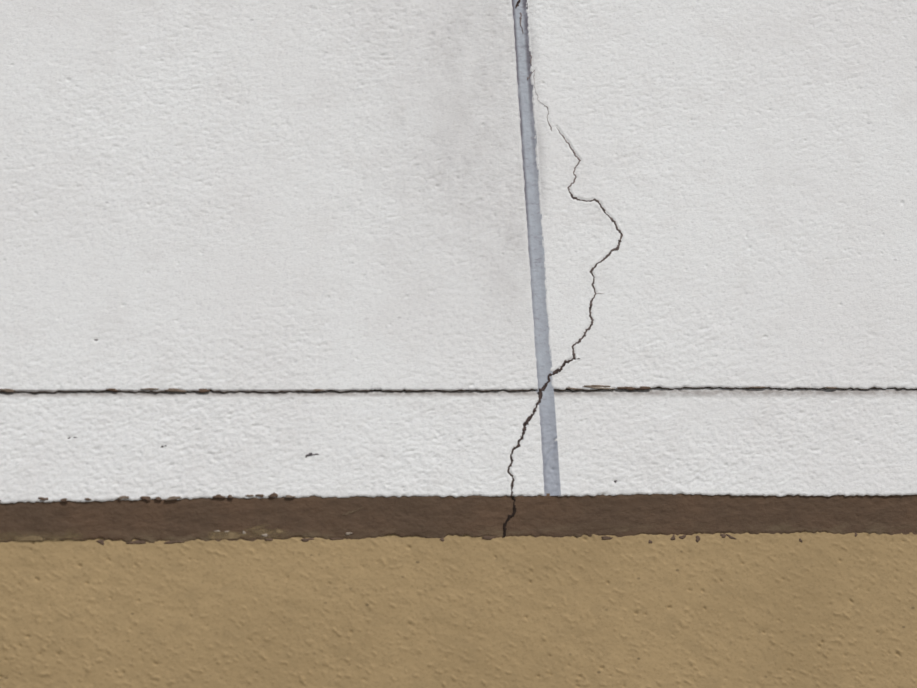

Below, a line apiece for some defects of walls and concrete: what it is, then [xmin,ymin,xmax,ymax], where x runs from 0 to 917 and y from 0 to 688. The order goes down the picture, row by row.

crack [502,55,623,538]